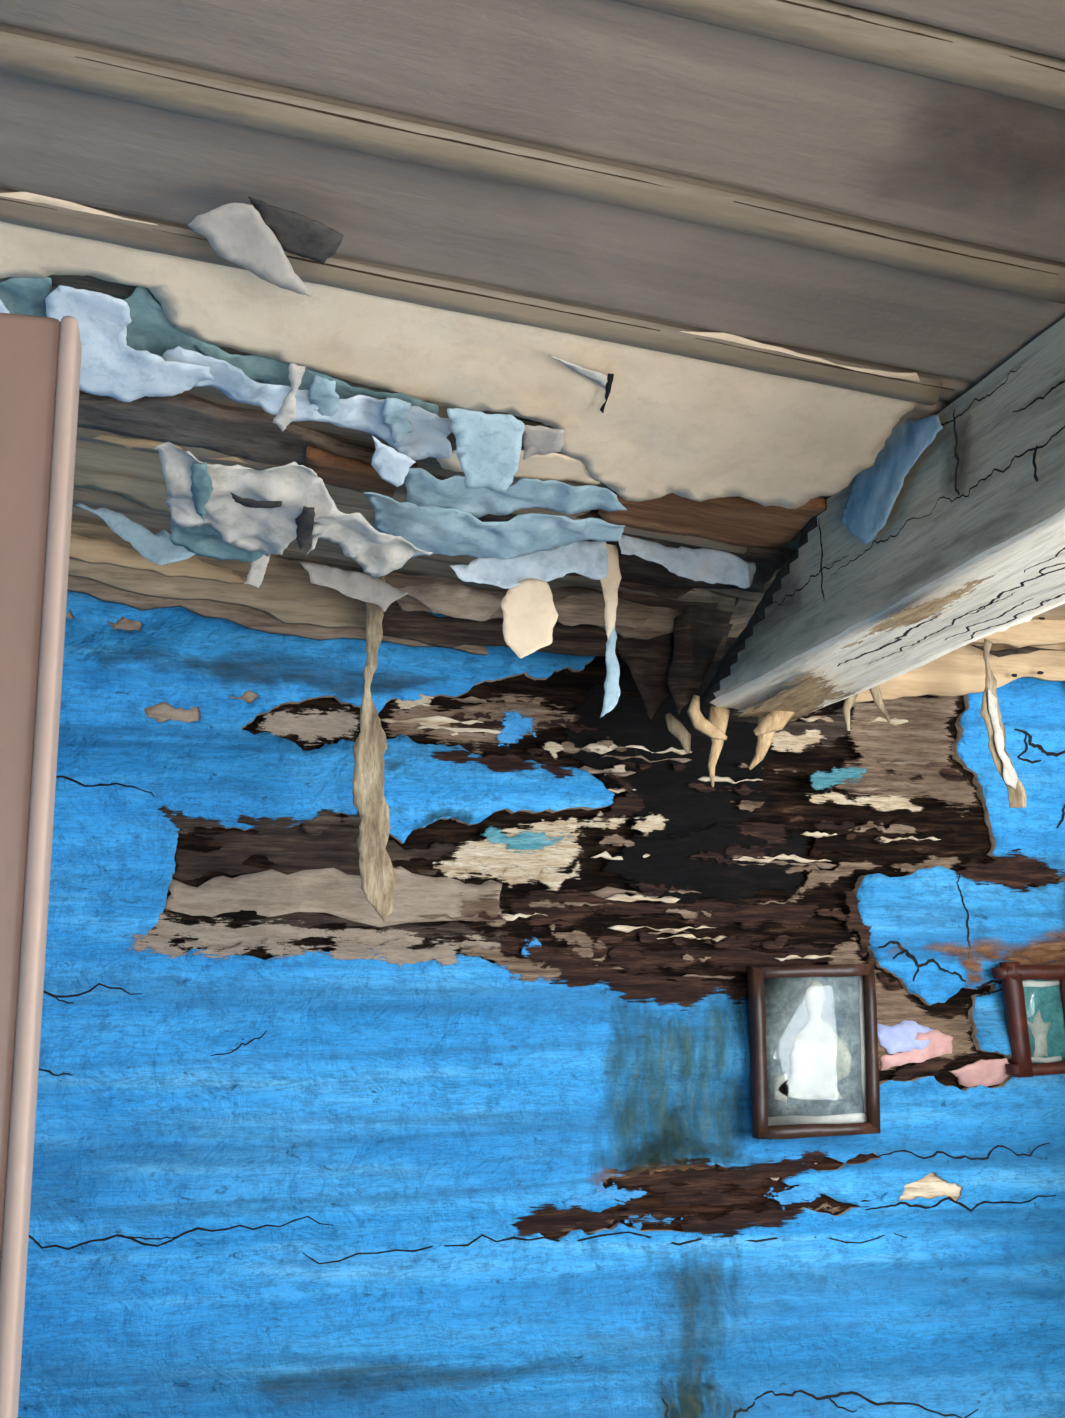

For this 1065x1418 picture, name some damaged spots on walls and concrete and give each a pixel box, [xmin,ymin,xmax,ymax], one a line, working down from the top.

peeling [0,191,157,225]
peeling [0,221,920,509]
crack [769,366,1065,608]
spalling [127,638,1065,1090]
leakage [614,1010,730,1177]
crack [29,1216,778,1264]
spalling [511,1150,878,1243]
crack [661,1398,669,1418]
crack [733,1390,979,1418]